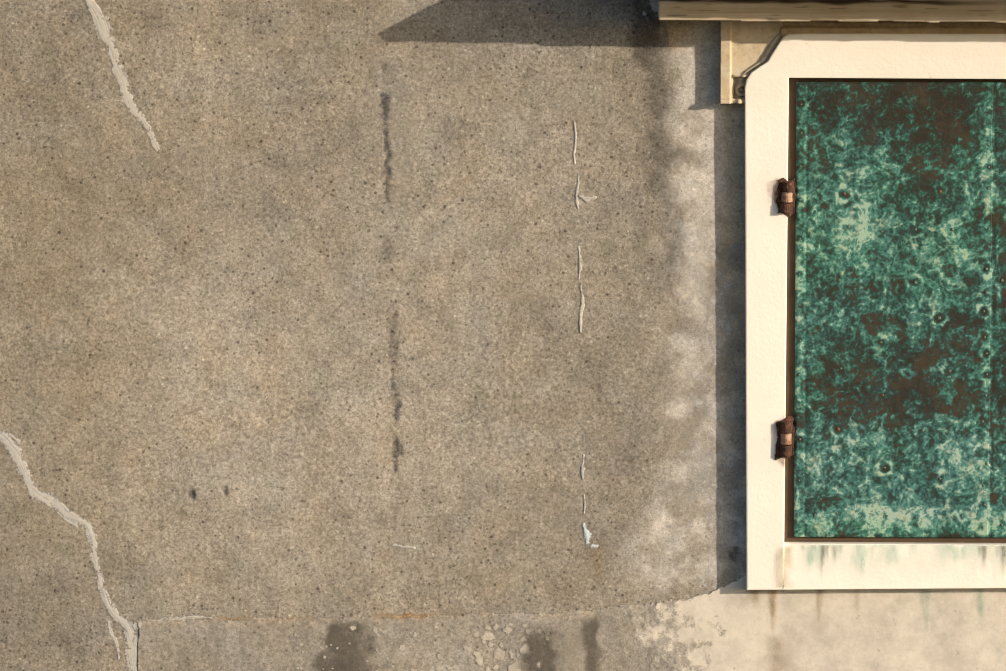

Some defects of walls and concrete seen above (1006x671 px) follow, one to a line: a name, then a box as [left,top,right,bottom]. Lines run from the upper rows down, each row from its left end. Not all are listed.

crack [85,0,161,152]
crack [380,94,391,198]
crack [573,121,597,209]
crack [577,246,585,333]
crack [393,394,402,471]
crack [579,454,587,514]
crack [0,430,218,671]
leakage [317,624,372,671]
leakage [524,622,599,671]